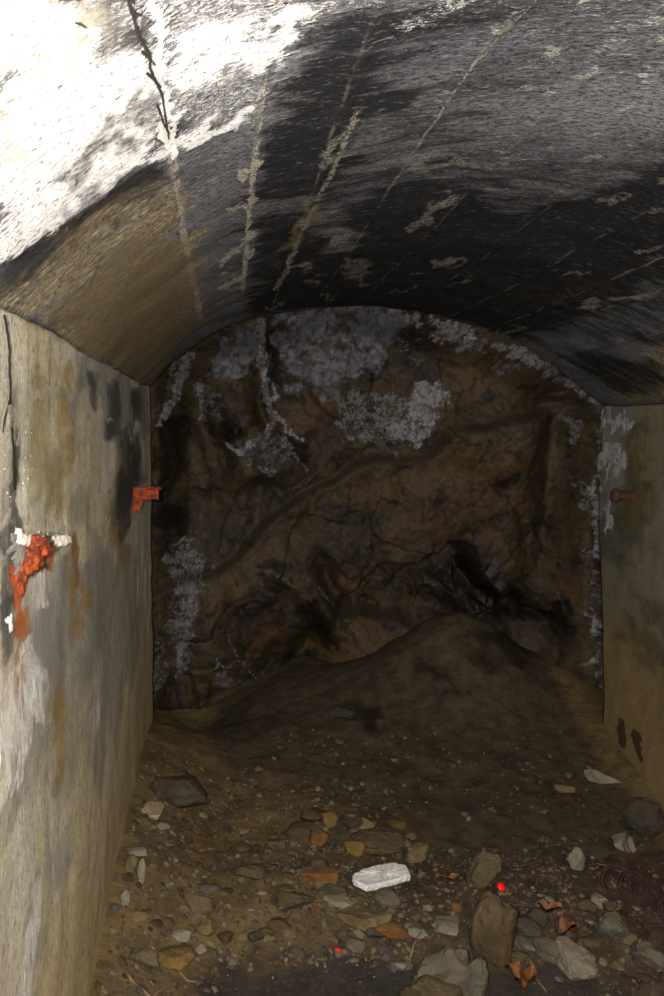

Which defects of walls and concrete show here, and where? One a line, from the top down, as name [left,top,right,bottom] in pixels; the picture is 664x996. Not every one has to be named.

crack [126,0,170,140]
crack [2,314,16,491]
leakage [0,0,635,701]
corrosion [10,552,53,719]